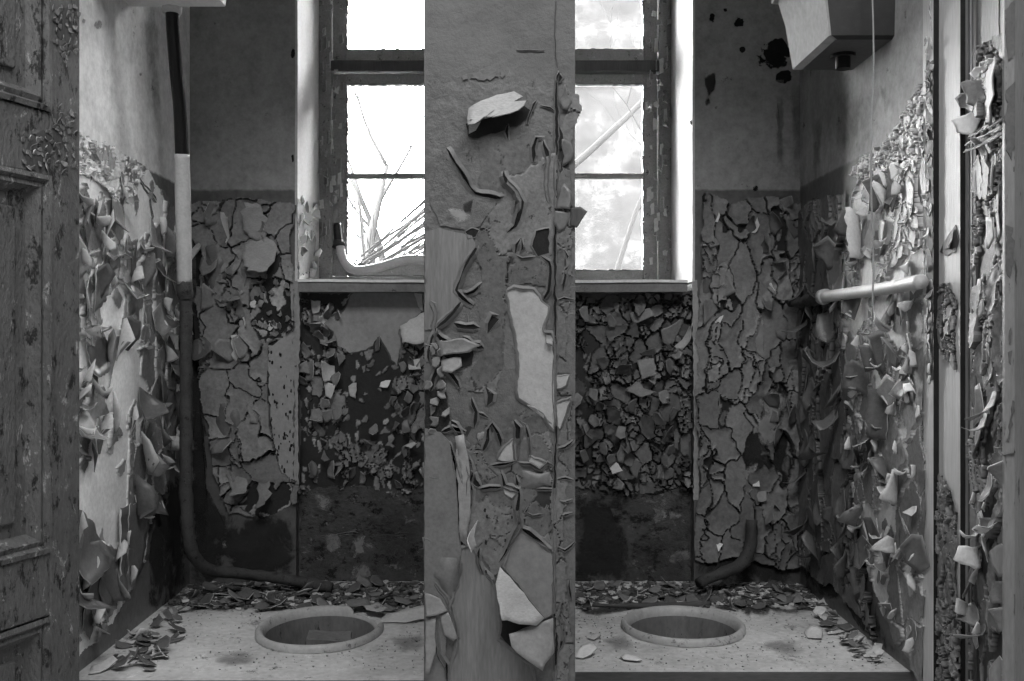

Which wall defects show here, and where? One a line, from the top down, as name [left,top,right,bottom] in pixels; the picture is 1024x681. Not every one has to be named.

water stain [709,8,744,27]
water stain [739,38,792,84]
peeling [21,103,181,656]
peeling [190,1,959,681]
peeling [934,0,1015,681]